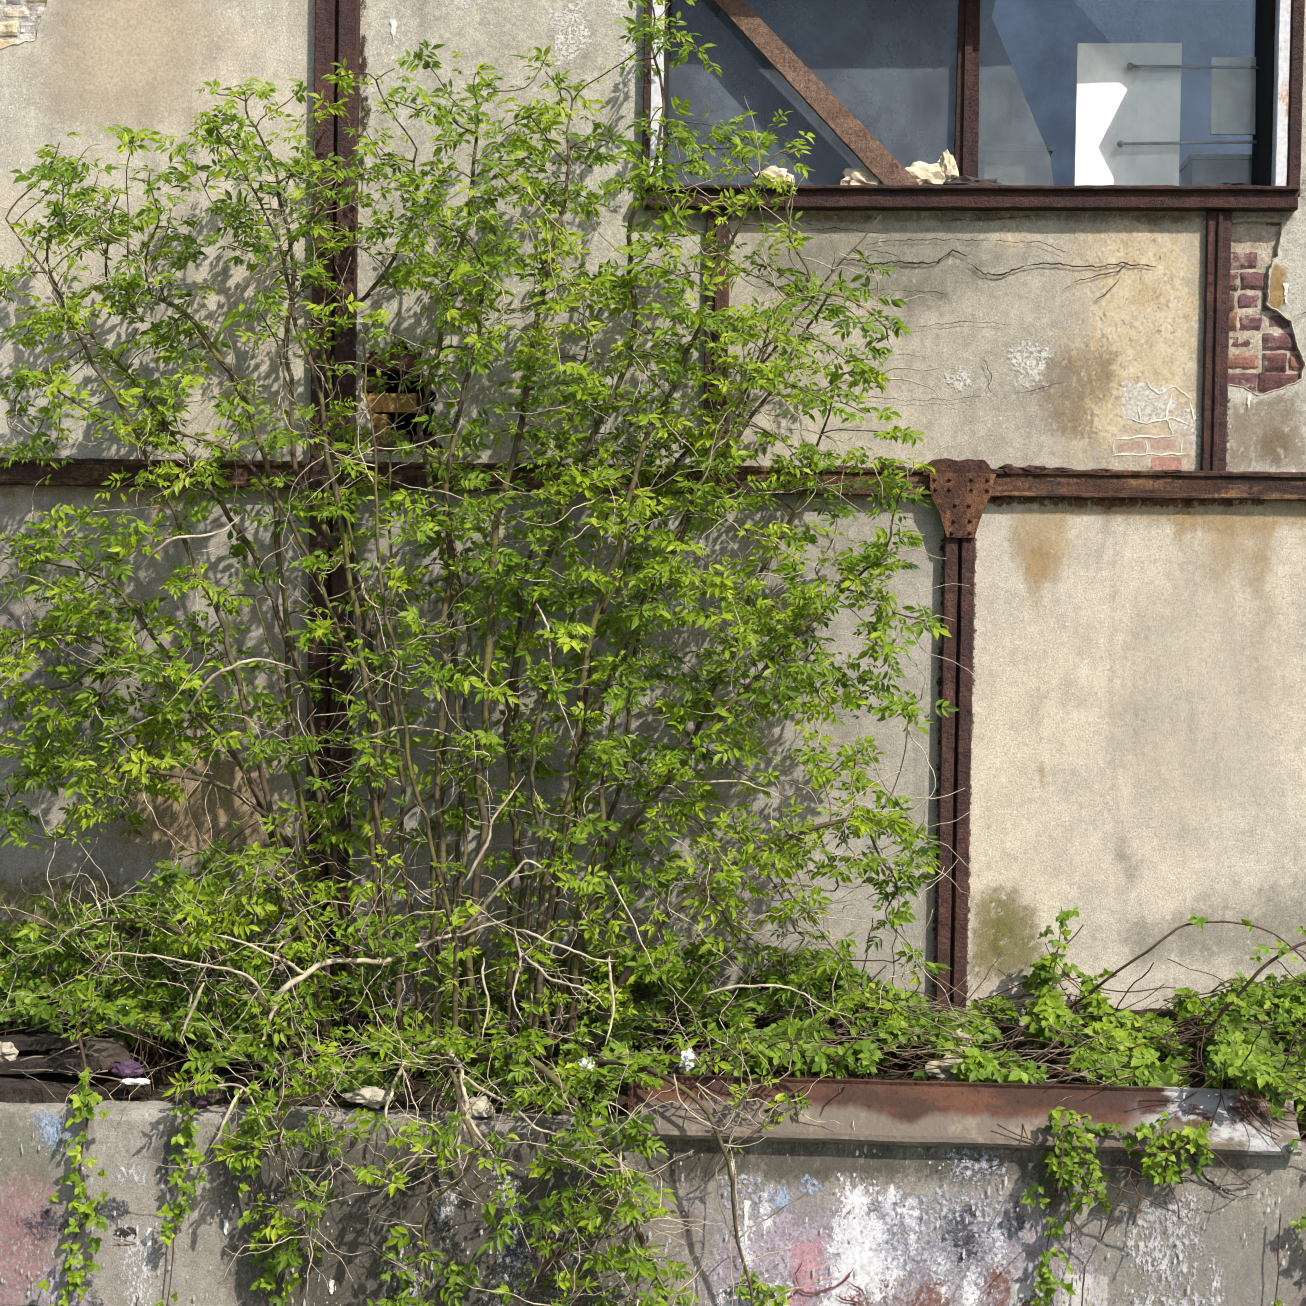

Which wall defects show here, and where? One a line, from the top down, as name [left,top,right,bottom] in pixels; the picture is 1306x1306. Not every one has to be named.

flaking render [0,0,48,50]
water stain [945,366,972,391]
crack [764,215,1157,358]
water stain [1008,213,1204,459]
flaking render [1228,219,1306,396]
corrosion [997,464,1072,473]
corrosion [931,647,942,1000]
peeling [695,1146,1042,1306]
peeling [1117,1192,1213,1306]